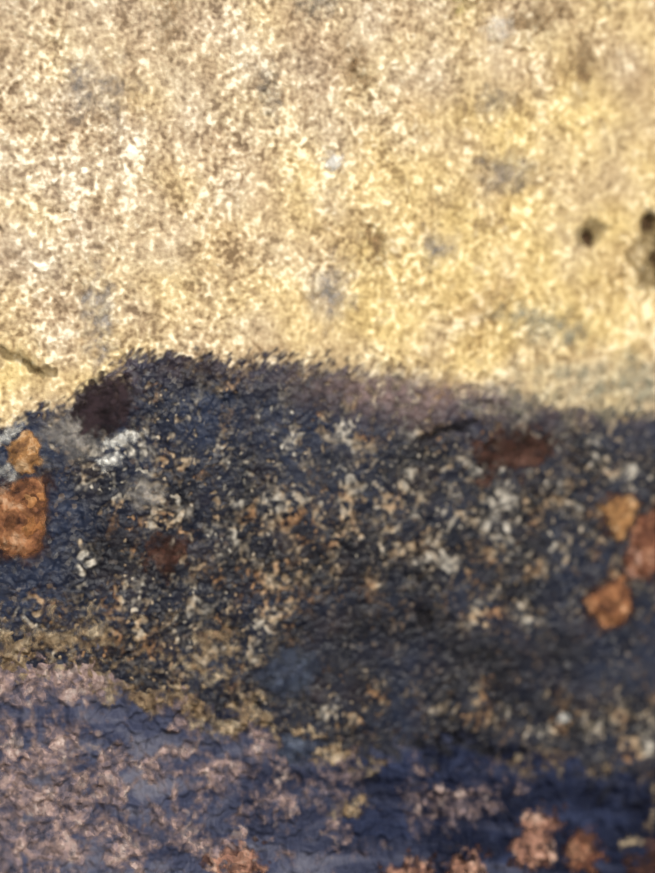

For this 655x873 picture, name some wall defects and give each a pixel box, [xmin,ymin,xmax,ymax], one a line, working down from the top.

damp [67,371,147,446]
damp [587,356,655,405]
corrosion [0,430,49,559]
corrosion [584,493,655,629]
damp [0,649,287,873]
damp [255,747,354,815]